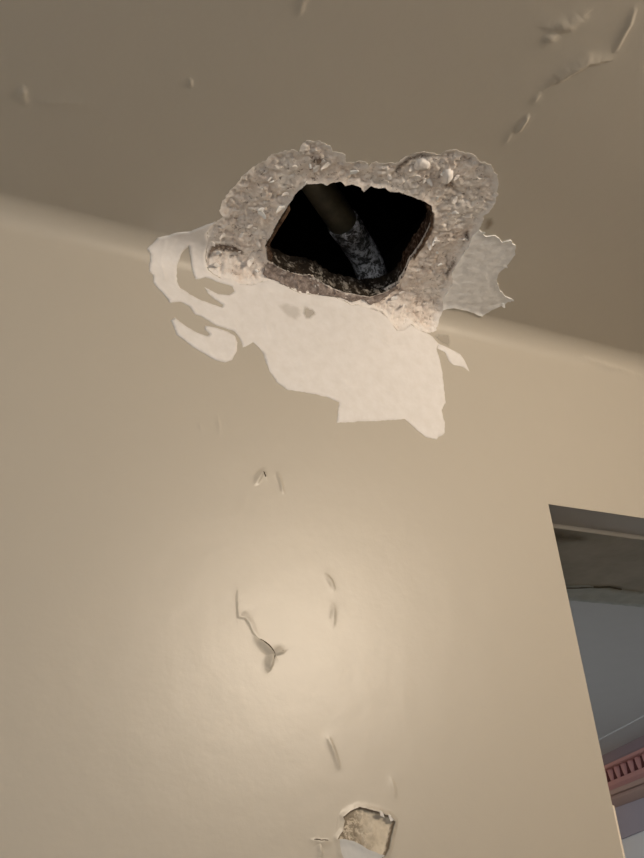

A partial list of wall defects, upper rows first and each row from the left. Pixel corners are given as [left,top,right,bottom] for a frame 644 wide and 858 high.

peeling [147,140,516,439]
flaking render [330,798,399,858]